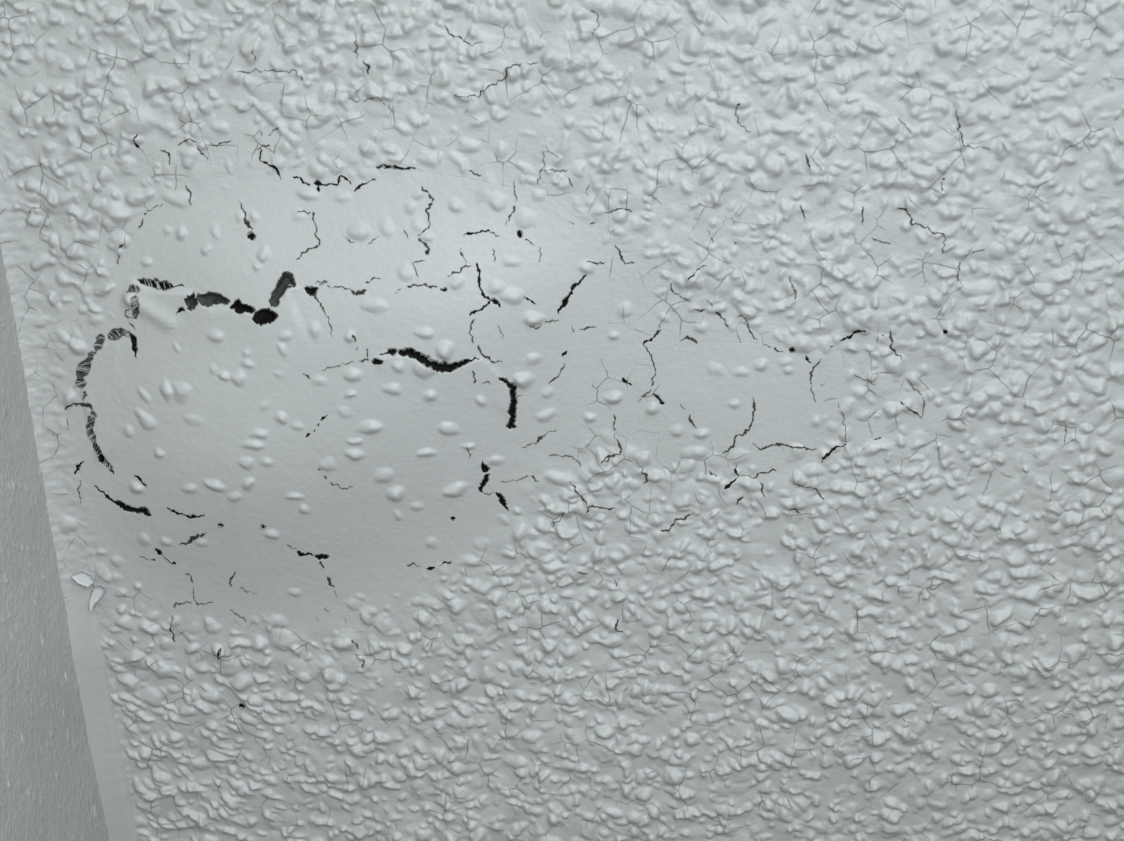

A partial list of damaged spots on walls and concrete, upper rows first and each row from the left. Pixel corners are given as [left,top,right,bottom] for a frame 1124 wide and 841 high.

crack [65,127,925,642]
crack [897,207,984,281]